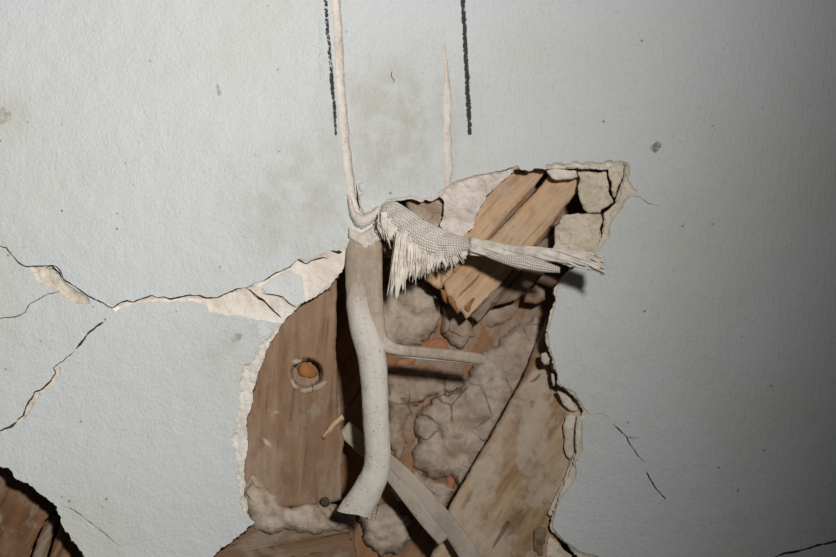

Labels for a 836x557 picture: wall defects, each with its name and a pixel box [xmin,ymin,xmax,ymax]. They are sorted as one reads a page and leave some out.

flaking render [359,160,638,253]
crack [0,246,342,431]
flaking render [113,247,347,556]
flaking render [533,262,598,557]
crack [585,411,666,500]
crack [775,540,836,557]